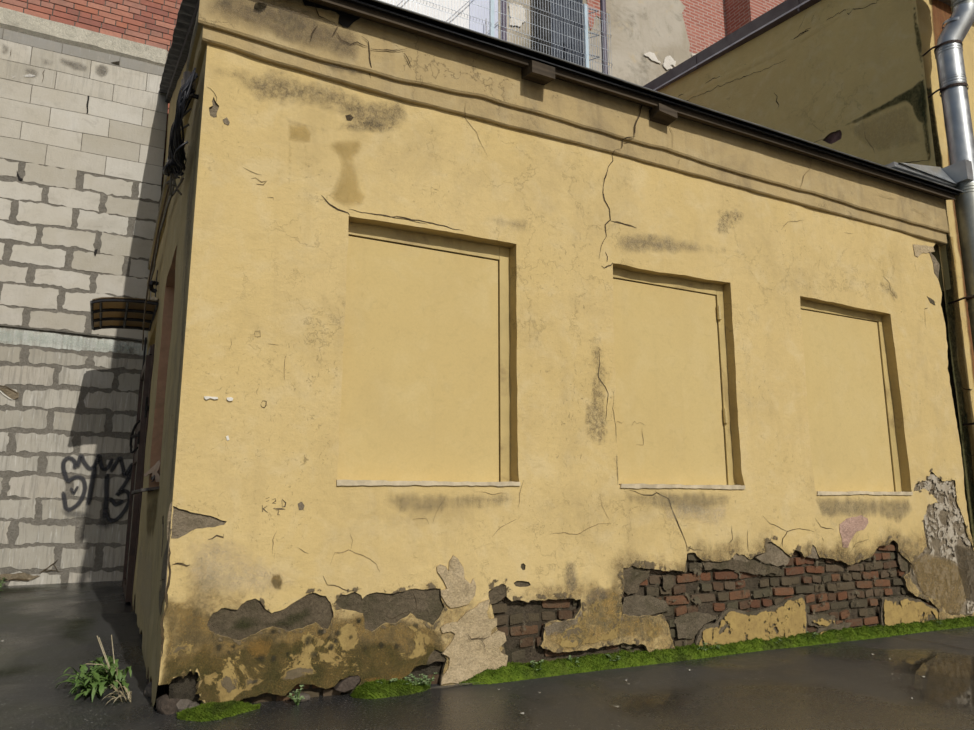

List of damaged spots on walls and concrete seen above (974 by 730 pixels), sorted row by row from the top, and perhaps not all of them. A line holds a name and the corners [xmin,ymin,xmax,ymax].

crack [310,4,411,78]
peeling [644,52,676,70]
spalling [824,131,842,144]
crack [322,196,463,231]
crack [599,105,643,268]
crack [598,353,616,425]
spalling [155,502,226,648]
spalling [160,576,447,704]
spalling [484,564,649,664]
crack [616,454,702,551]
spalling [618,468,974,648]
crack [764,517,832,546]